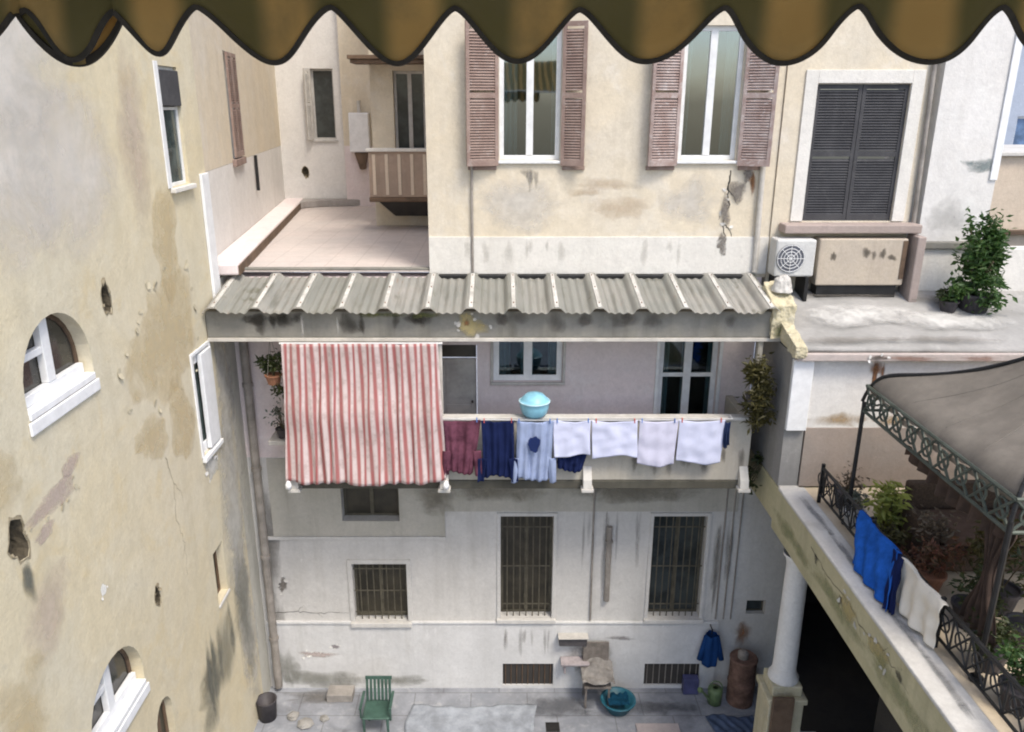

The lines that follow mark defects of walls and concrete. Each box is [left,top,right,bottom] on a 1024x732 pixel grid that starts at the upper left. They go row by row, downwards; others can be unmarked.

crack [718,170,736,237]
spalling [100,277,113,316]
spalling [454,313,492,338]
rust [871,364,885,382]
spalling [7,456,80,565]
spalling [154,583,162,607]